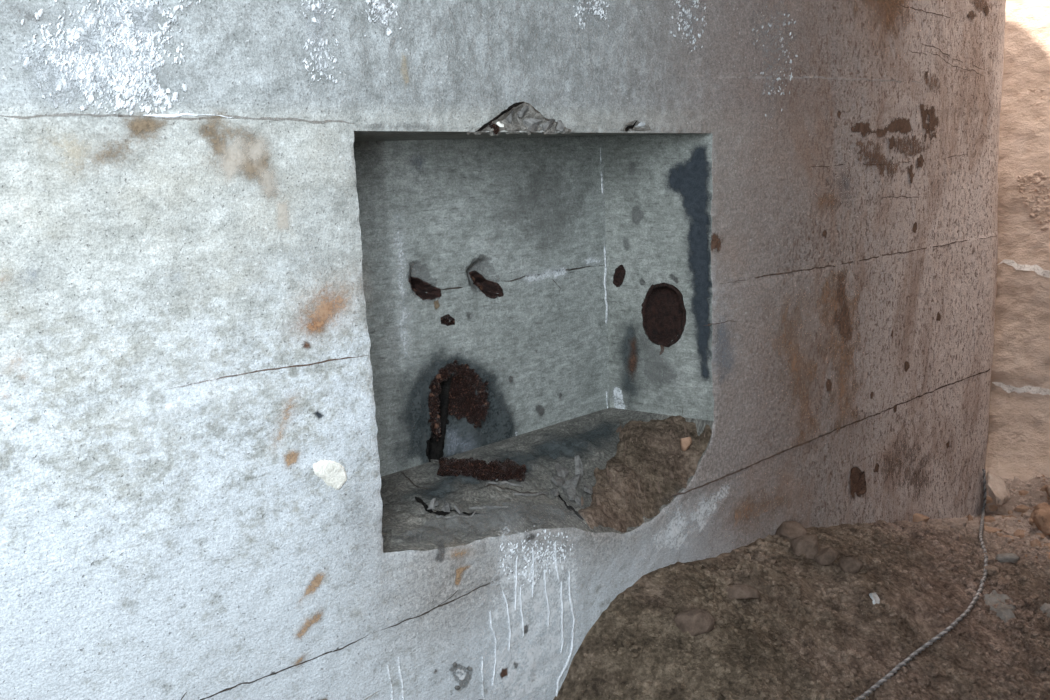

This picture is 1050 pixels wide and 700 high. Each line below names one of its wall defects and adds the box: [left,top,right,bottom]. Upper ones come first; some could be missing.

spalling [467,101,571,136]
damp [916,104,939,143]
damp [906,155,924,183]
damp [667,146,712,379]
crack [720,236,995,284]
crack [166,355,367,390]
crack [668,369,990,499]
crack [181,571,514,700]